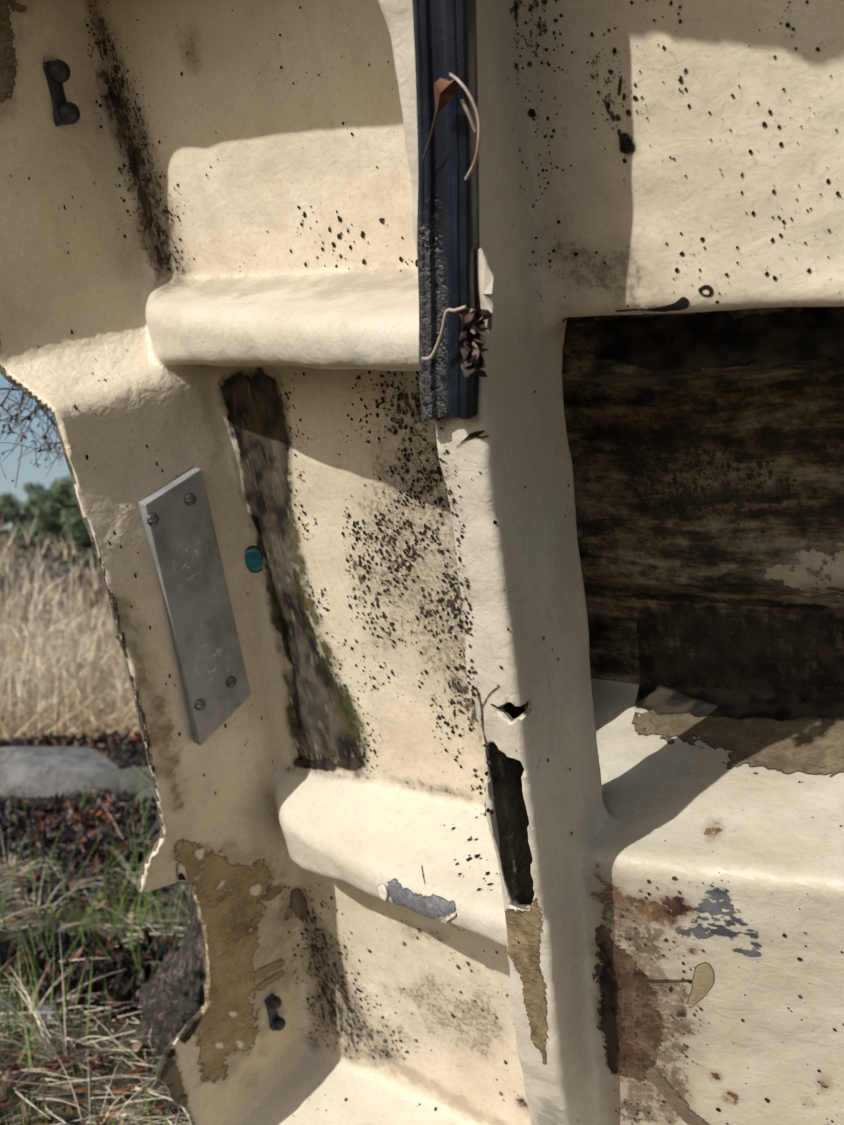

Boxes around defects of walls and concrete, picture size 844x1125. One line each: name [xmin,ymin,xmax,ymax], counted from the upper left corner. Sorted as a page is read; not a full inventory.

peeling [0,0,27,103]
damp [85,2,189,290]
damp [585,27,648,181]
damp [594,246,844,372]
damp [222,369,495,819]
peeling [764,543,844,598]
peeling [174,839,285,1084]
damp [284,883,418,1060]
peeling [377,865,465,931]
damp [454,836,500,890]
spalling [505,897,548,1064]
rust [591,864,703,1125]